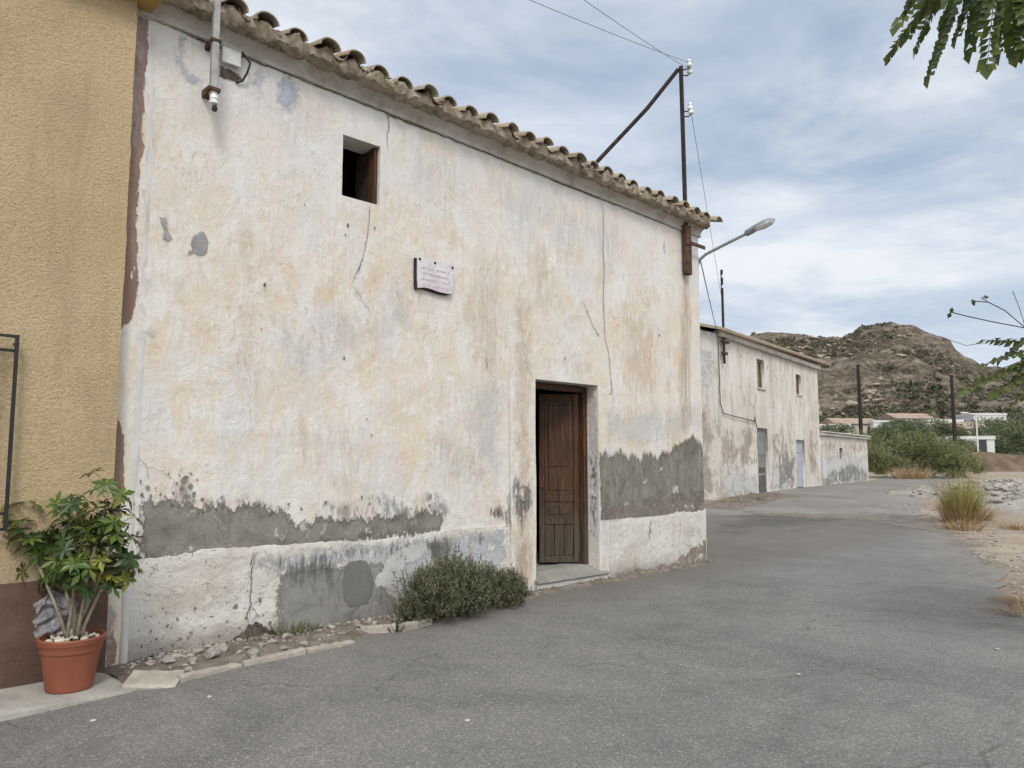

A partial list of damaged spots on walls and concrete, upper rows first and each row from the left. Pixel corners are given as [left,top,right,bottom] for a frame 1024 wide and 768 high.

crack [137,14,678,394]
flaking render [599,434,705,520]
water stain [779,452,795,488]
crack [247,555,258,623]
flaking render [106,420,443,673]
water stain [260,482,531,599]